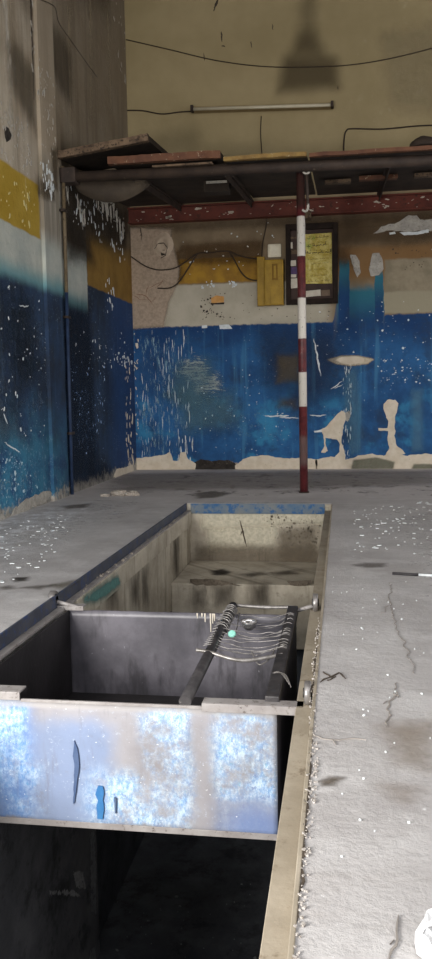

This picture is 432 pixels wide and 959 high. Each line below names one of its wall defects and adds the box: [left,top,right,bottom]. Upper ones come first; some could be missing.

peeling [30,20,432,478]
crack [311,621,346,709]
crack [383,583,415,726]
crack [297,735,366,921]